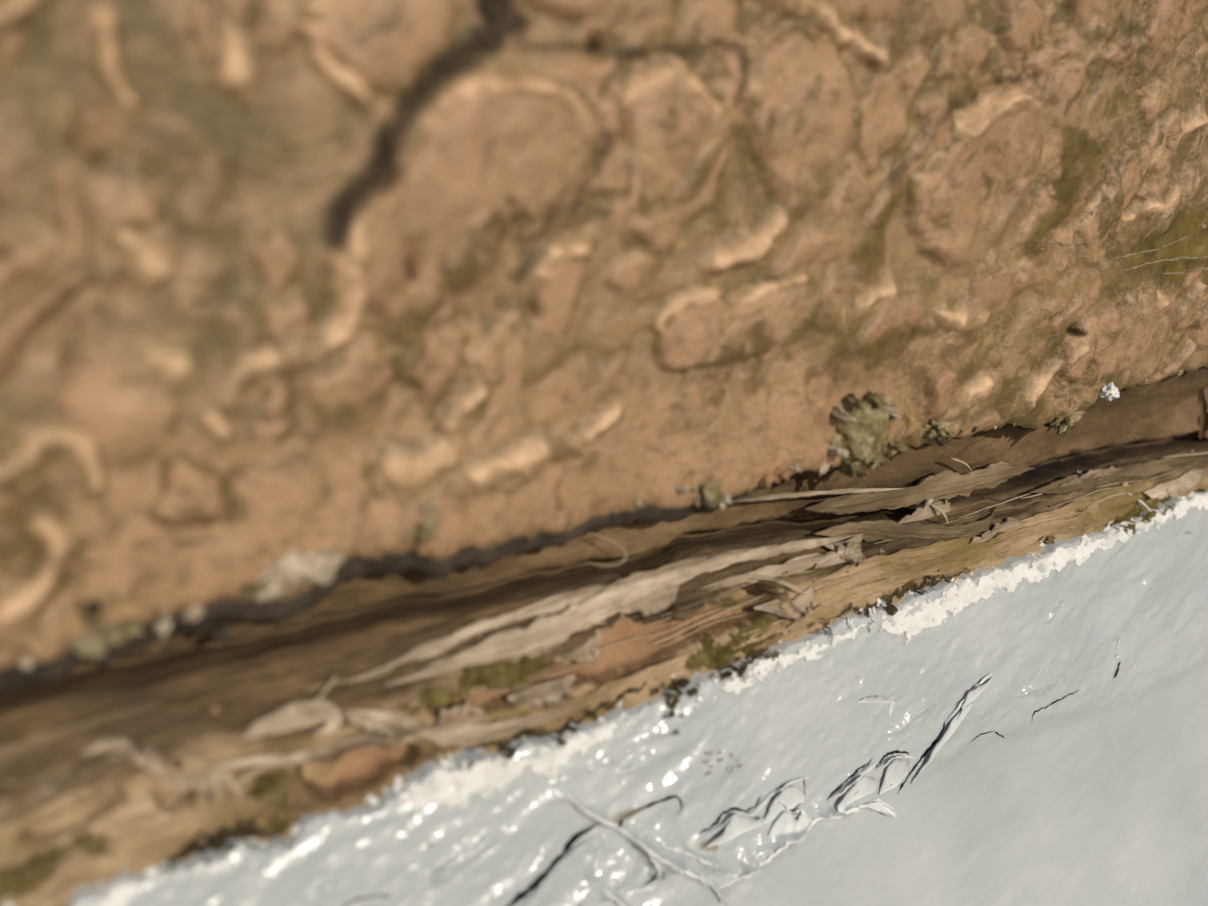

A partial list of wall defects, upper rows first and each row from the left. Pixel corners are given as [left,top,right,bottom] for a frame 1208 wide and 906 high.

crack [1032,690,1080,720]
crack [508,795,682,906]